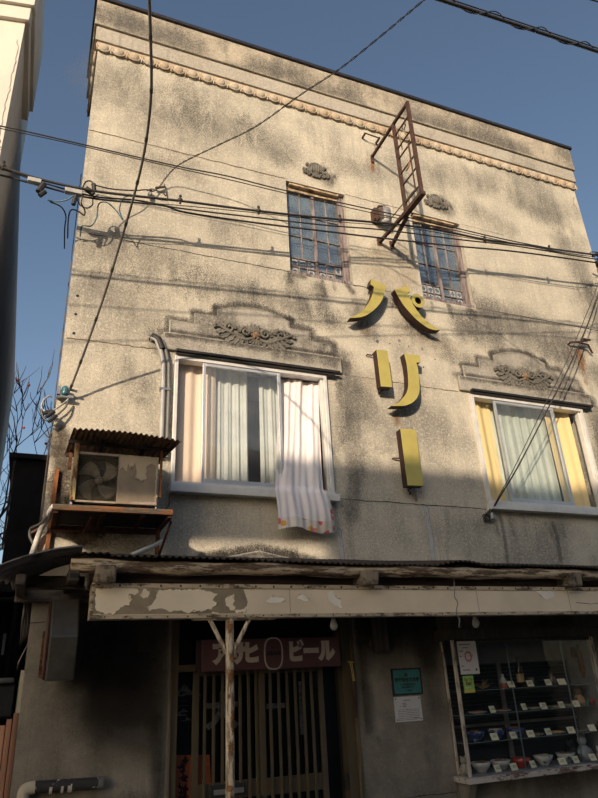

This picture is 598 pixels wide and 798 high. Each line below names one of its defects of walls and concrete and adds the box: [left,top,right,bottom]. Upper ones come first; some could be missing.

damp [457,304,595,405]
damp [47,425,73,504]
damp [57,524,105,546]
damp [197,545,314,564]
peeling [93,586,248,615]
peeling [536,590,555,600]
damp [69,603,168,741]